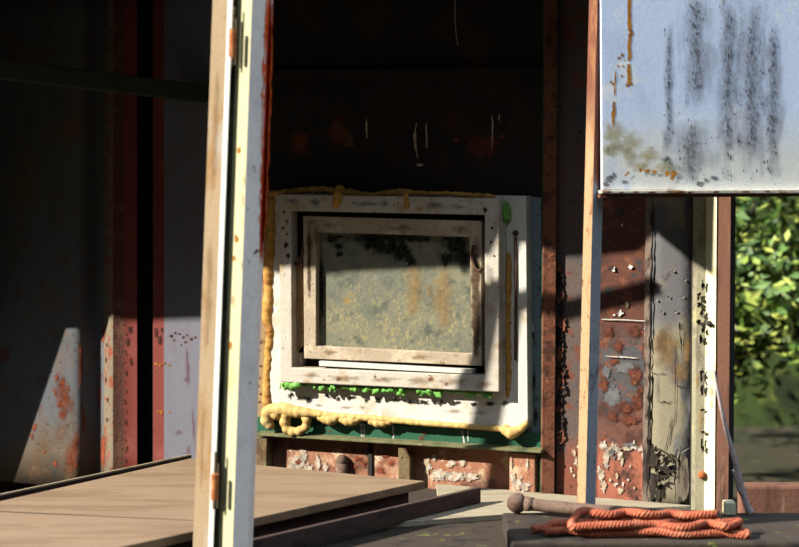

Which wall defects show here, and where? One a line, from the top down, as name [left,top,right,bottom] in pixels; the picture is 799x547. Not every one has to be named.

corrosion [610,0,633,126]
water stain [685,2,706,102]
water stain [719,0,779,173]
corrosion [259,0,273,260]
water stain [669,119,712,182]
peeling [696,280,705,344]
corrosion [53,375,69,418]
corrosion [607,325,644,426]
peeling [287,448,328,472]
peeling [422,454,479,482]
peeling [510,456,531,492]
spalling [597,440,689,502]